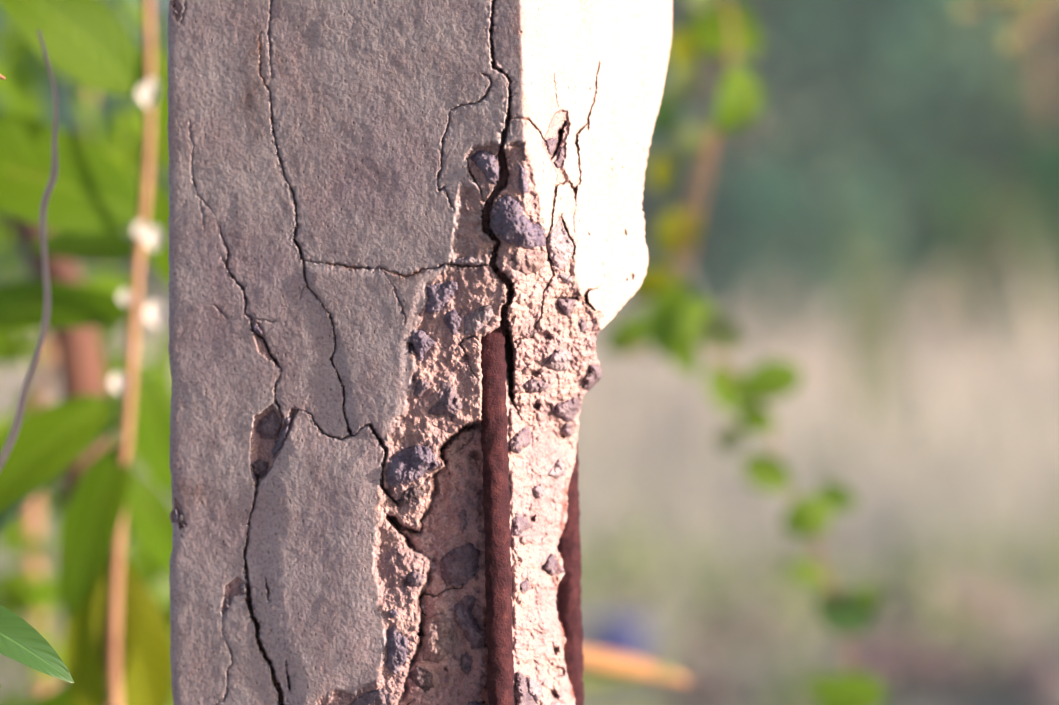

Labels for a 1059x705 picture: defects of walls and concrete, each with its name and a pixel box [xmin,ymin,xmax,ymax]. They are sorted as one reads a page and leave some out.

crack [397,1,590,408]
spalling [542,110,570,183]
crack [312,327,482,534]
spalling [317,143,602,705]
crack [244,475,290,705]
crack [418,588,455,644]